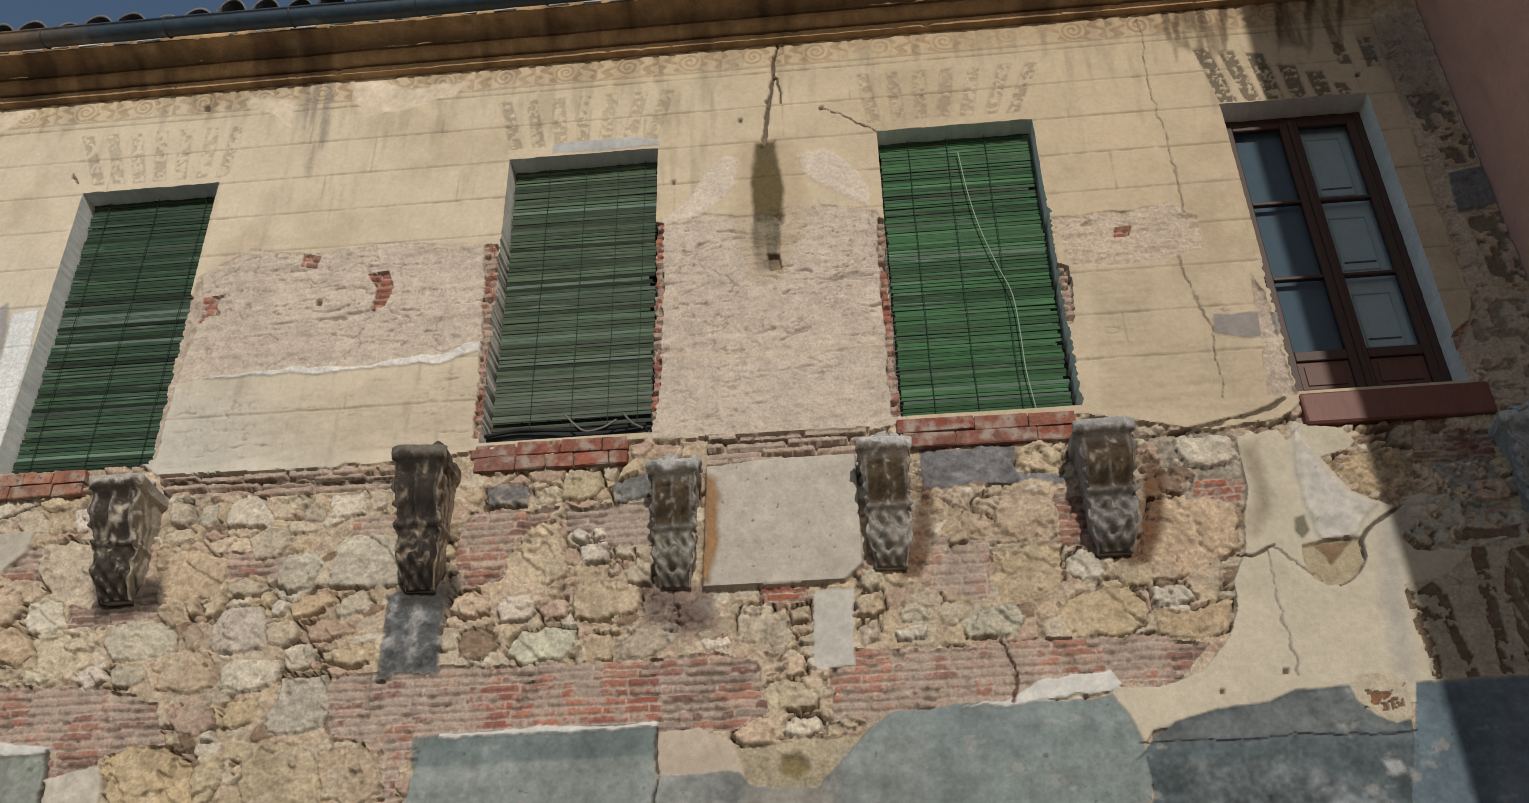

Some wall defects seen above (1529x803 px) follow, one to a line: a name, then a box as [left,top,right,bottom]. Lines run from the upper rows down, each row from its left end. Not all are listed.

damp [1161,6,1226,46]
damp [1275,0,1342,43]
crack [763,44,782,146]
crack [818,107,877,132]
damp [752,142,785,270]
spalling [1370,5,1529,403]
flaking render [153,241,500,460]
flaking render [647,148,907,441]
crack [1134,255,1286,440]
crack [1237,503,1402,676]
flaking render [1302,535,1364,585]
spalling [1350,671,1414,722]